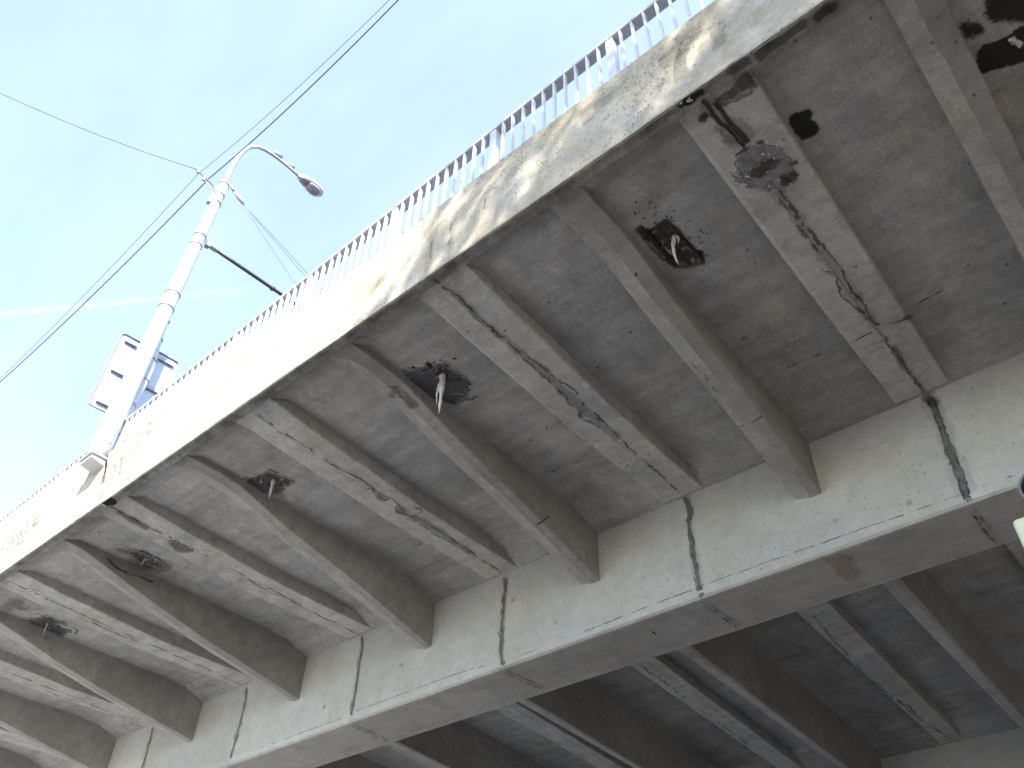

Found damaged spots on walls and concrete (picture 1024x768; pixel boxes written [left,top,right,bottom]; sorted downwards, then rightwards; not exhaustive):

leakage [959,0,1024,73]
leakage [789,109,819,140]
spalling [634,201,714,268]
spalling [405,358,471,406]
spalling [248,471,292,495]
crack [433,279,996,640]
spalling [132,550,164,569]
crack [5,415,541,768]